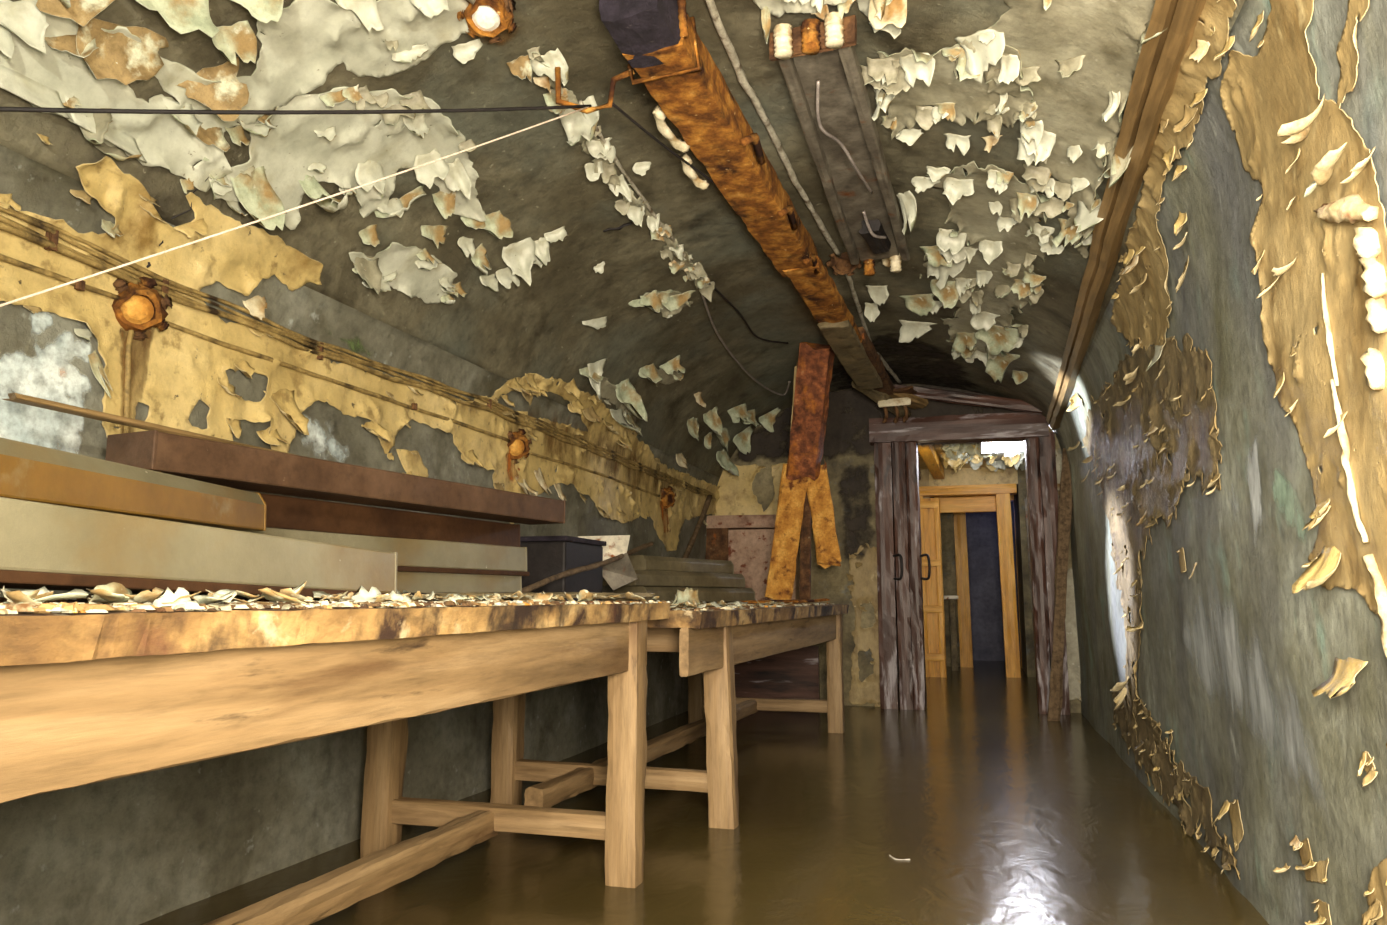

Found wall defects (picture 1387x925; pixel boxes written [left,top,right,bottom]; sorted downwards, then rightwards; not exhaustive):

rust [652,105,709,190]
rust [739,133,766,165]
rust [777,205,798,230]
peeling [753,0,1166,385]
peeling [0,0,787,552]
peeling [940,443,1026,474]
peeling [1055,0,1387,880]
peeling [846,543,880,707]
peeling [1273,834,1332,925]
peeling [1361,858,1387,925]